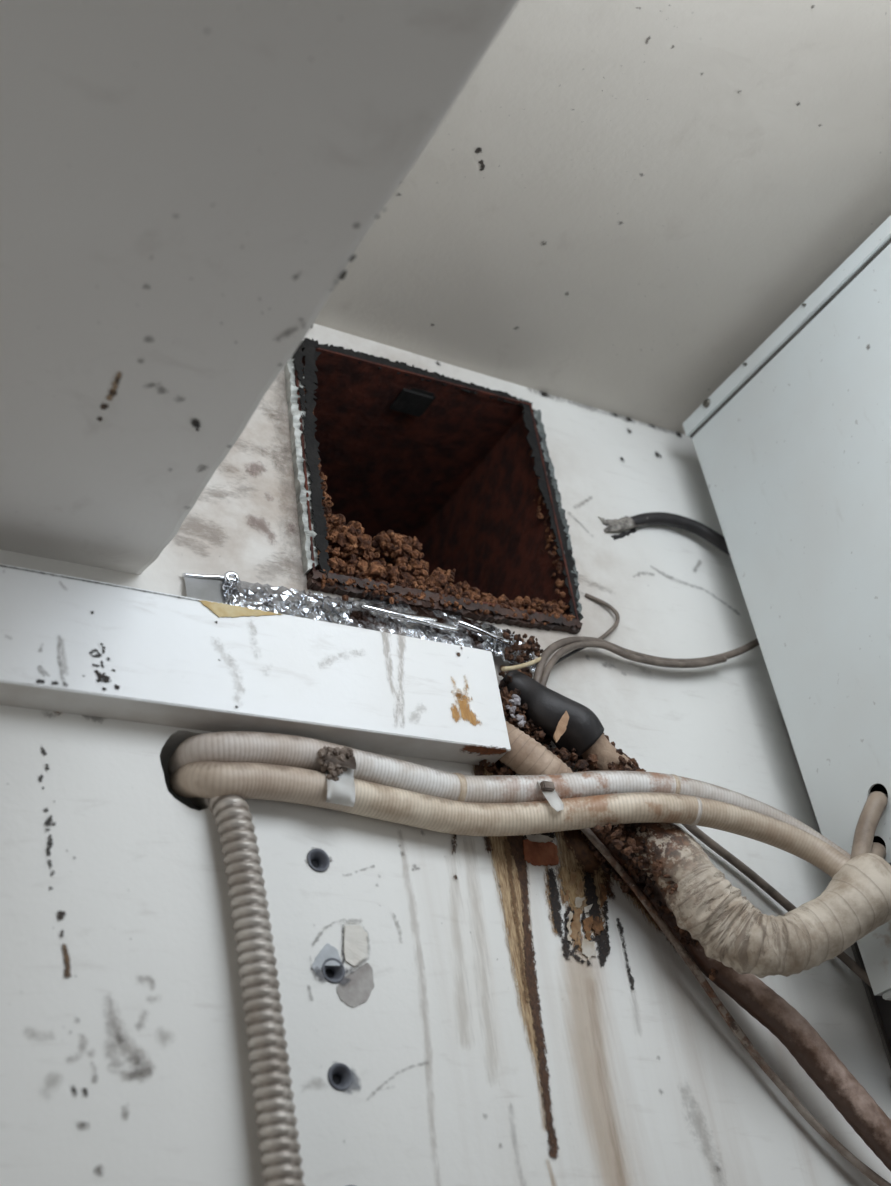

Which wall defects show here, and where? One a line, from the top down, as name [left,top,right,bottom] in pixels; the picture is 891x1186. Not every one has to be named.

corrosion [451,680,480,726]
peeling [523,832,611,967]
corrosion [484,835,559,1159]